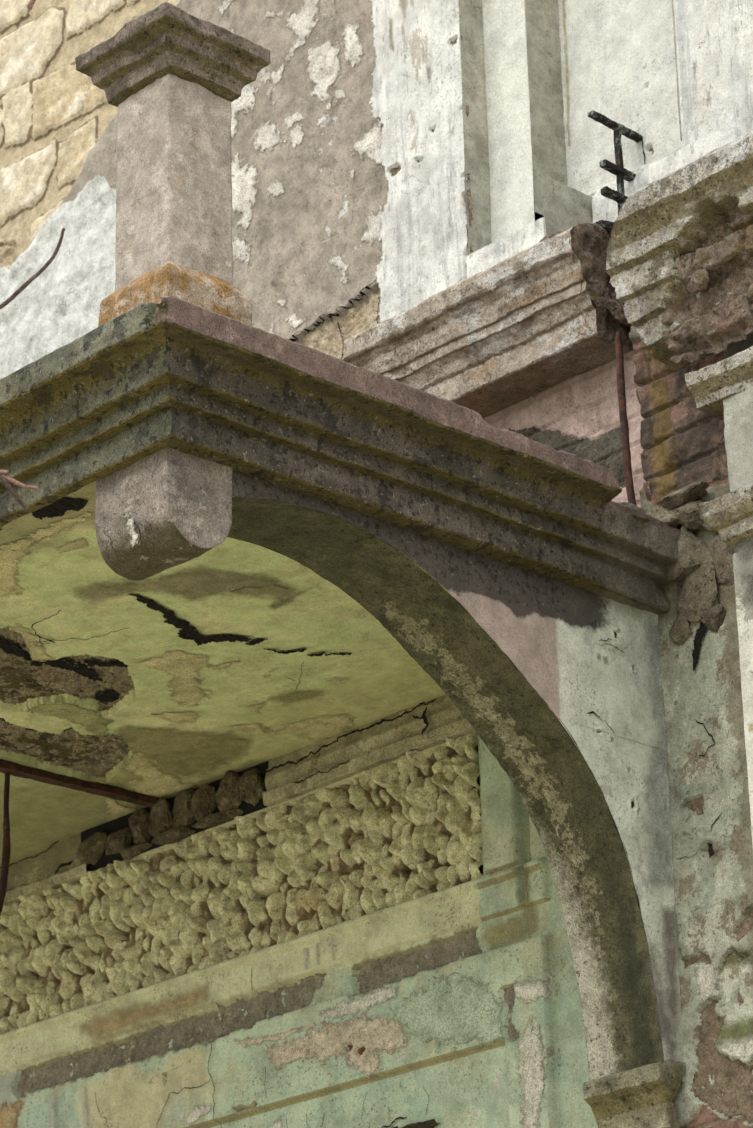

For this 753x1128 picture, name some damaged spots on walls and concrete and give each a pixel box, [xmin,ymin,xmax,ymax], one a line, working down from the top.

peeling [231,0,364,266]
peeling [348,116,401,180]
flaking render [0,243,17,268]
peeling [360,204,383,247]
flaking render [268,290,380,359]
water stain [508,425,631,488]
peeling [0,498,93,597]
spalling [616,480,741,645]
crack [31,593,352,689]
spalling [0,624,265,865]
flaking render [0,930,558,1128]
flaking render [682,908,753,1124]